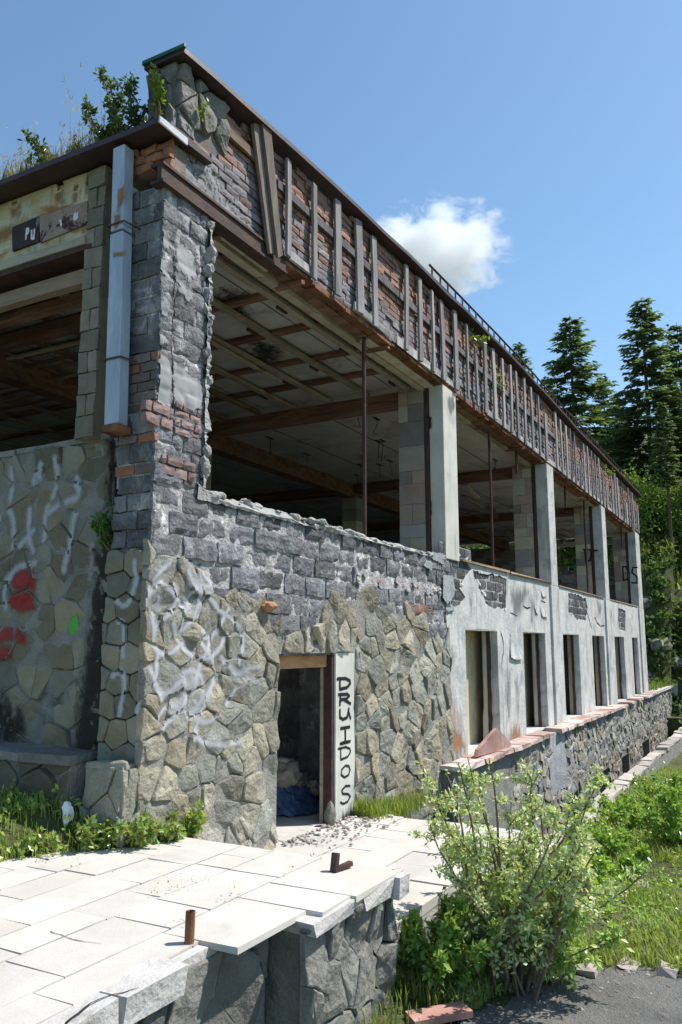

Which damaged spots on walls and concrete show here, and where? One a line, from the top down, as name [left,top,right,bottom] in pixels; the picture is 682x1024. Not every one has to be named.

spalling [141,219,218,488]
spalling [356,541,507,617]
spalling [568,593,588,620]
rust [452,730,464,751]